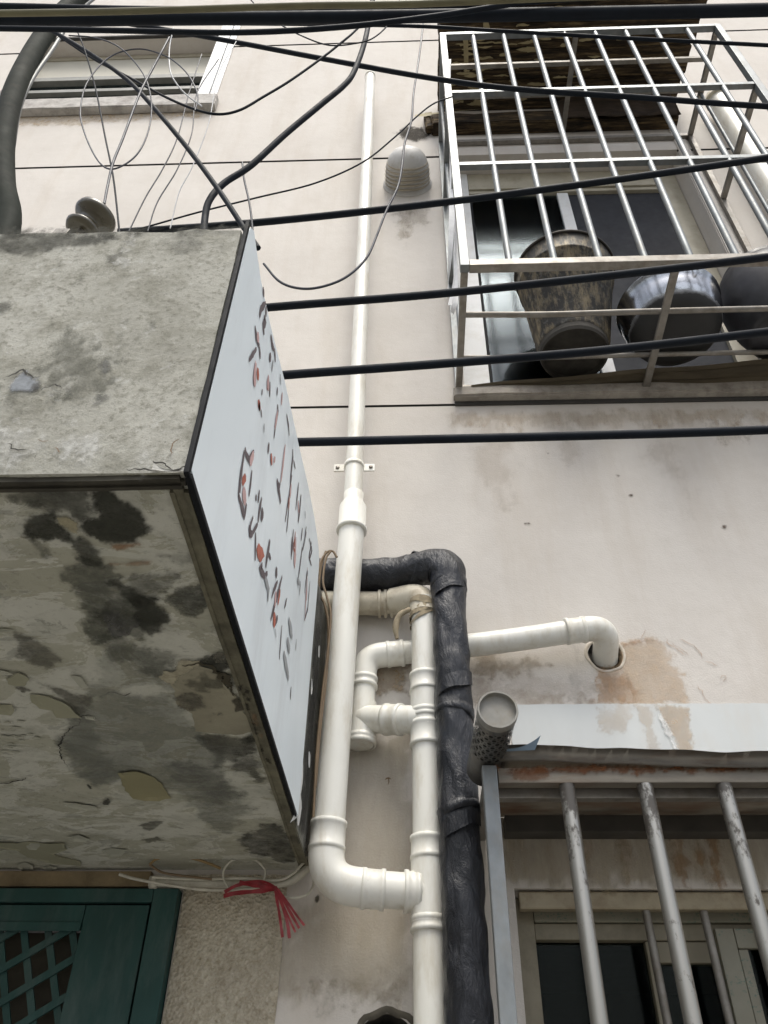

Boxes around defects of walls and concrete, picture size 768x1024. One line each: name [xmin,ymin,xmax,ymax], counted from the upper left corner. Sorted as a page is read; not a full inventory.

spalling [7,369,62,391]
damp [9,491,207,644]
damp [199,656,230,673]
peeling [0,670,95,721]
peeling [160,660,258,735]
peeling [118,771,171,801]
damp [194,735,264,783]
corrosion [511,764,749,779]
peeling [0,835,89,871]
damp [242,824,295,863]